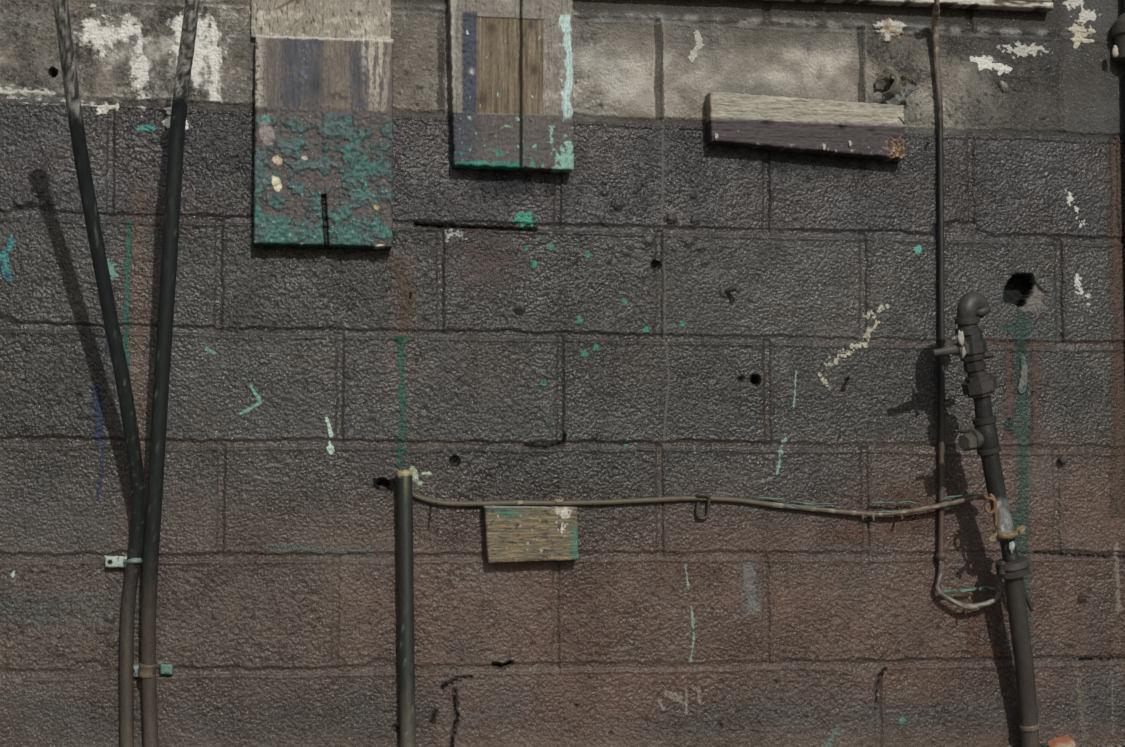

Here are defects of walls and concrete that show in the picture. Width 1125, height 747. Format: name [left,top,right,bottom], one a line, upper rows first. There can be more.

hole [1003,275,1045,313]